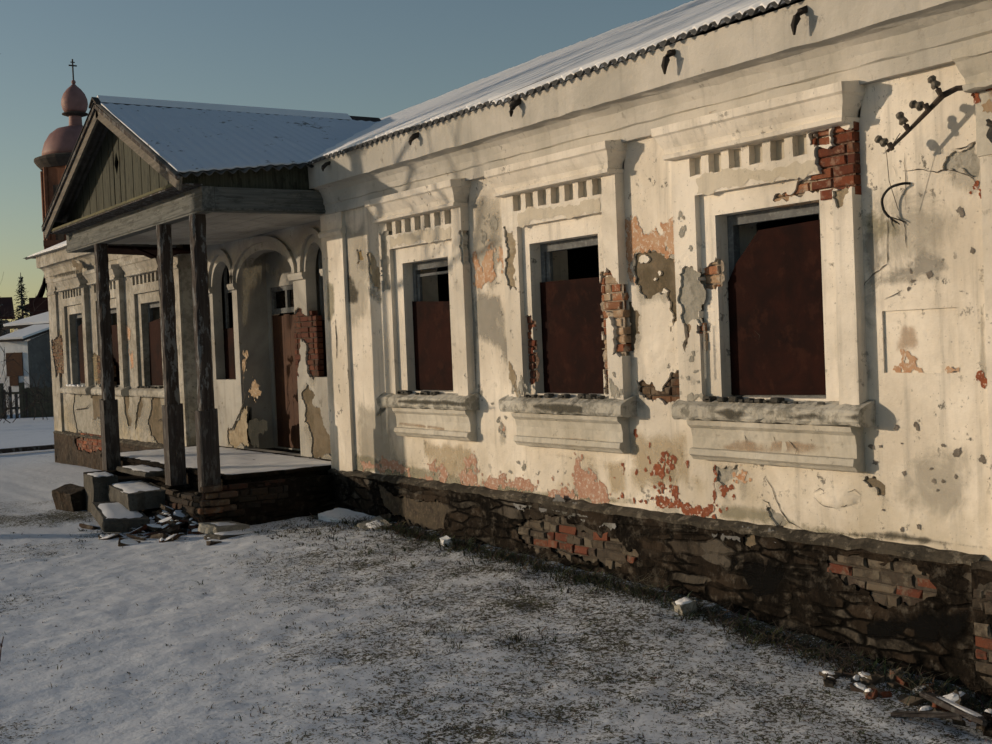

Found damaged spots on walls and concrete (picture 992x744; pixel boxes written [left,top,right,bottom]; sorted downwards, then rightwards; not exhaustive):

peeling [971,88,992,113]
flaking render [774,121,862,208]
peeling [460,212,517,289]
flaking render [600,211,725,404]
flaking render [125,396,163,444]
flaking render [294,308,331,459]
flaking render [509,316,540,397]
flaking render [360,442,756,569]
flaking render [865,444,885,495]